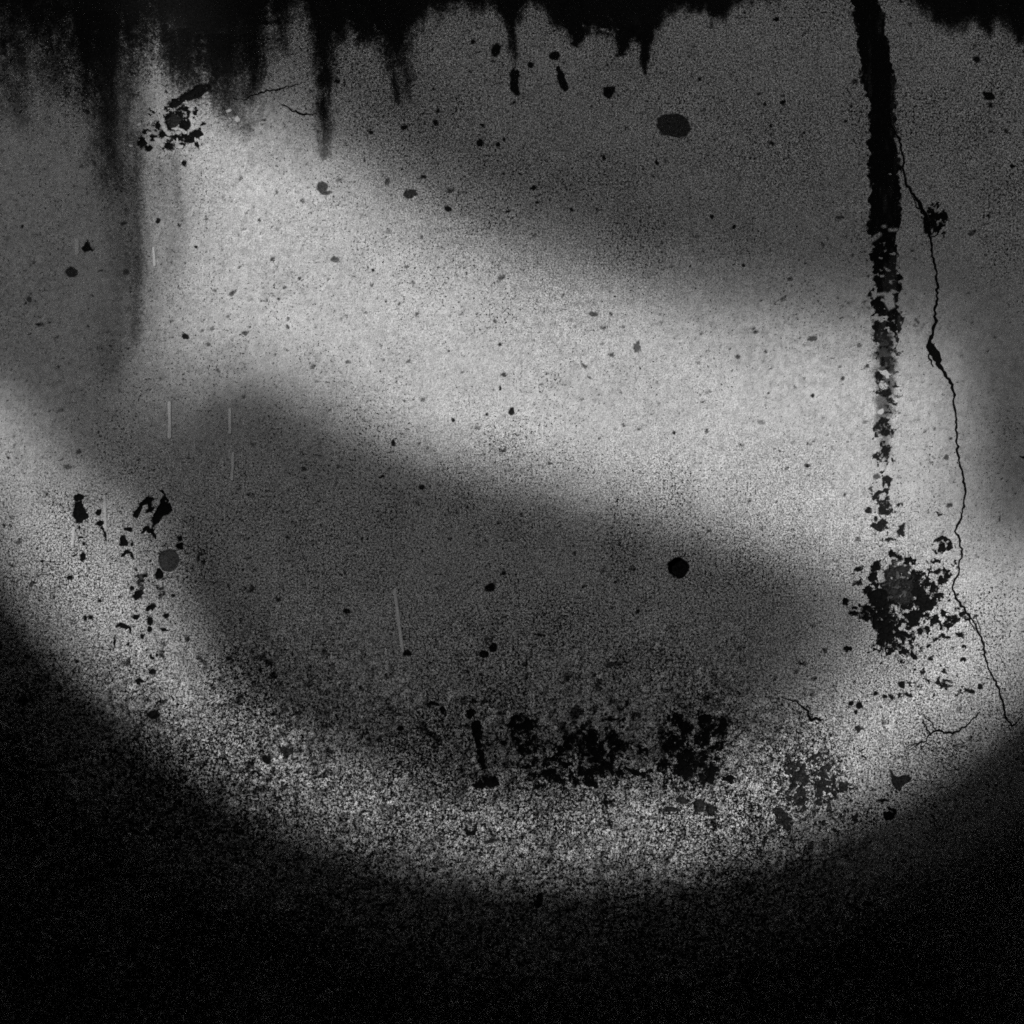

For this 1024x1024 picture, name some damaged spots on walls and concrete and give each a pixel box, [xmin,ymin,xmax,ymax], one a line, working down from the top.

water stain [910,0,1024,44]
spalling [129,83,211,166]
water stain [0,0,752,181]
water stain [850,0,905,542]
crack [888,111,1023,747]
spalling [72,494,107,561]
spalling [119,490,184,559]
spalling [113,568,175,647]
spalling [842,535,983,700]
spalling [848,701,863,733]
spalling [466,700,736,829]